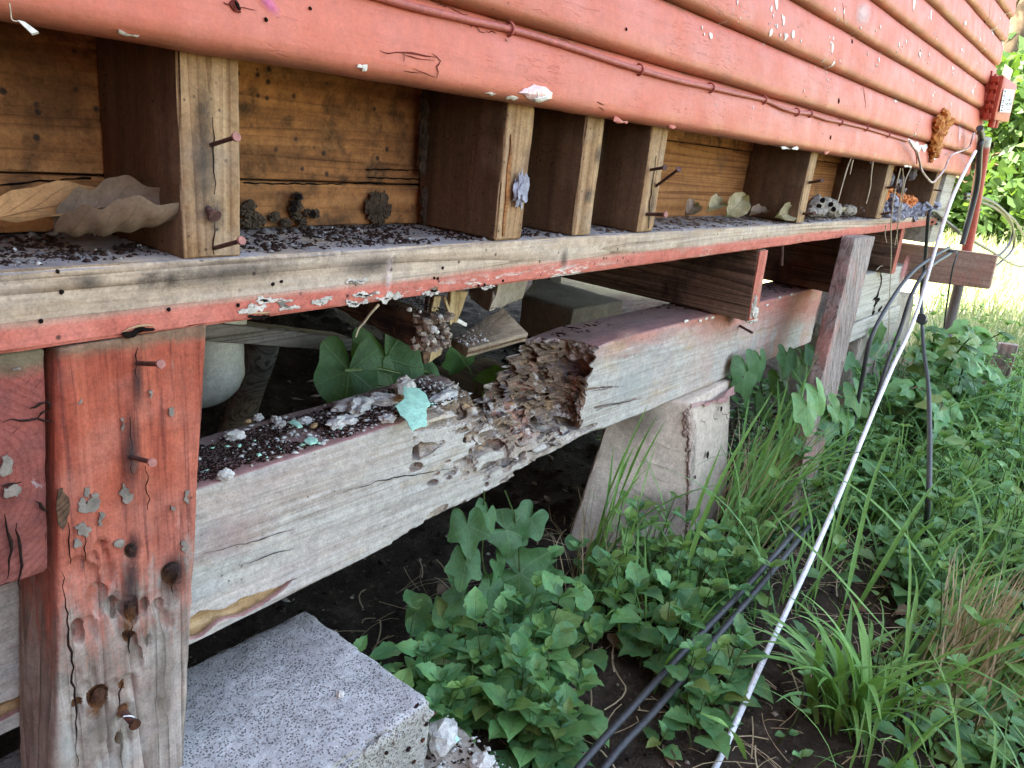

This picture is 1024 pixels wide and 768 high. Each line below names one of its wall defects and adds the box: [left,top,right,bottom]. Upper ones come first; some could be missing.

peeling [763,0,802,46]
crack [380,50,441,77]
peeling [238,295,333,325]
peeling [345,277,404,307]
peeling [455,363,575,473]
peeling [0,453,22,498]
crack [2,482,86,764]
corrosion [90,688,106,715]